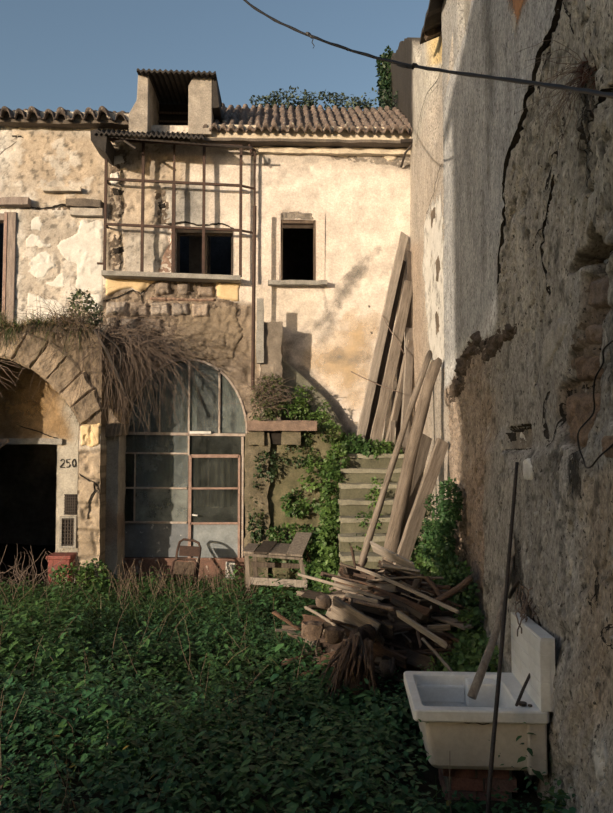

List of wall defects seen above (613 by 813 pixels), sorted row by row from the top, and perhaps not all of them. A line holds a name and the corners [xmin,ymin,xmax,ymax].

spalling [26,149,243,363]
crack [164,221,234,229]
peeling [422,192,445,370]
spalling [445,323,517,403]
crack [497,0,574,290]
spalling [562,261,612,448]
crack [79,474,100,519]